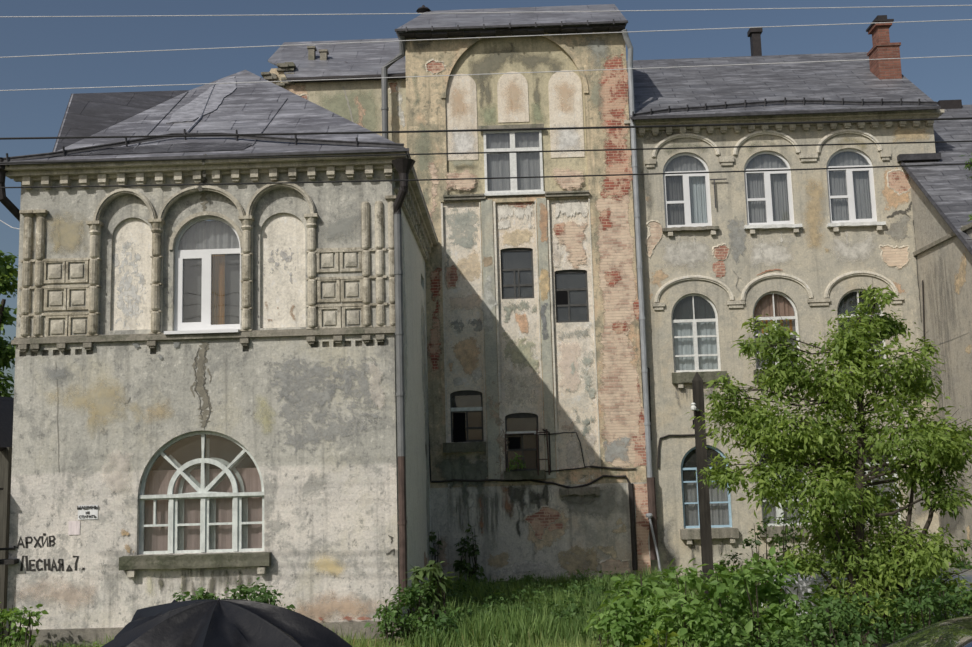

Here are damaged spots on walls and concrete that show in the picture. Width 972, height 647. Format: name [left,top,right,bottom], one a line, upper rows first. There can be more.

flaking render [882,168,911,210]
flaking render [427,161,482,375]
flaking render [497,54,730,468]
flaking render [834,233,910,270]
crack [887,201,922,322]
crack [190,341,212,429]
damp [421,309,552,552]
damp [565,487,617,518]
flaking render [599,483,651,577]